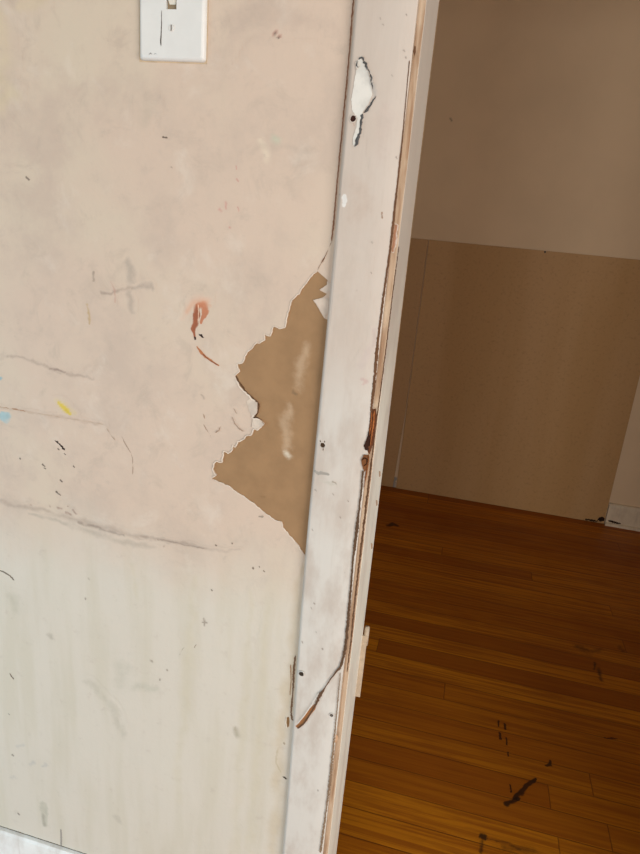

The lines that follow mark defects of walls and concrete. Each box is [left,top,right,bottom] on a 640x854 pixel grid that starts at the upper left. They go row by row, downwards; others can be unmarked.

peeling [351,57,380,148]
rust [176,289,220,367]
peeling [212,271,331,554]
crack [290,60,410,853]